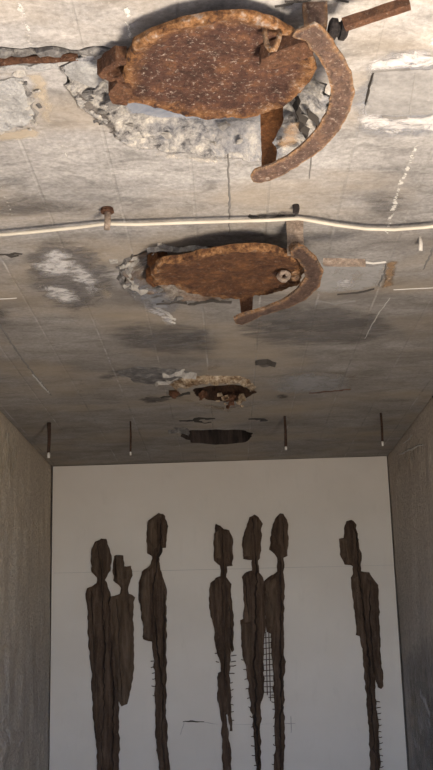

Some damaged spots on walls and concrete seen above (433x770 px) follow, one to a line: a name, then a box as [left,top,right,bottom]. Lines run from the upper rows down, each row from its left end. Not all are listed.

spalling [61,54,262,162]
spalling [272,75,329,160]
damp [28,243,112,310]
spalling [109,243,232,309]